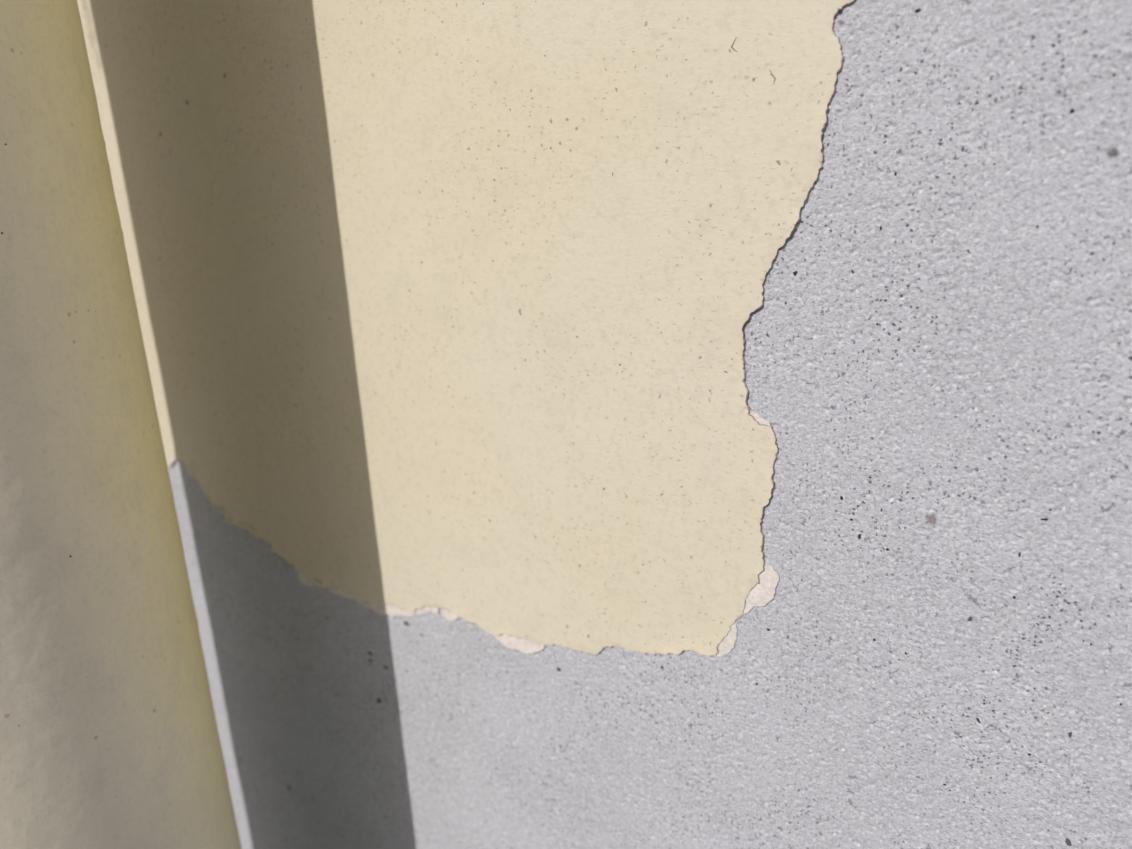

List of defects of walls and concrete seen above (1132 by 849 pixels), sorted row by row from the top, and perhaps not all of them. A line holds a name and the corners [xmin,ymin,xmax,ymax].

peeling [782,37,844,247]
peeling [742,312,779,498]
peeling [716,622,738,657]
peeling [743,562,780,614]